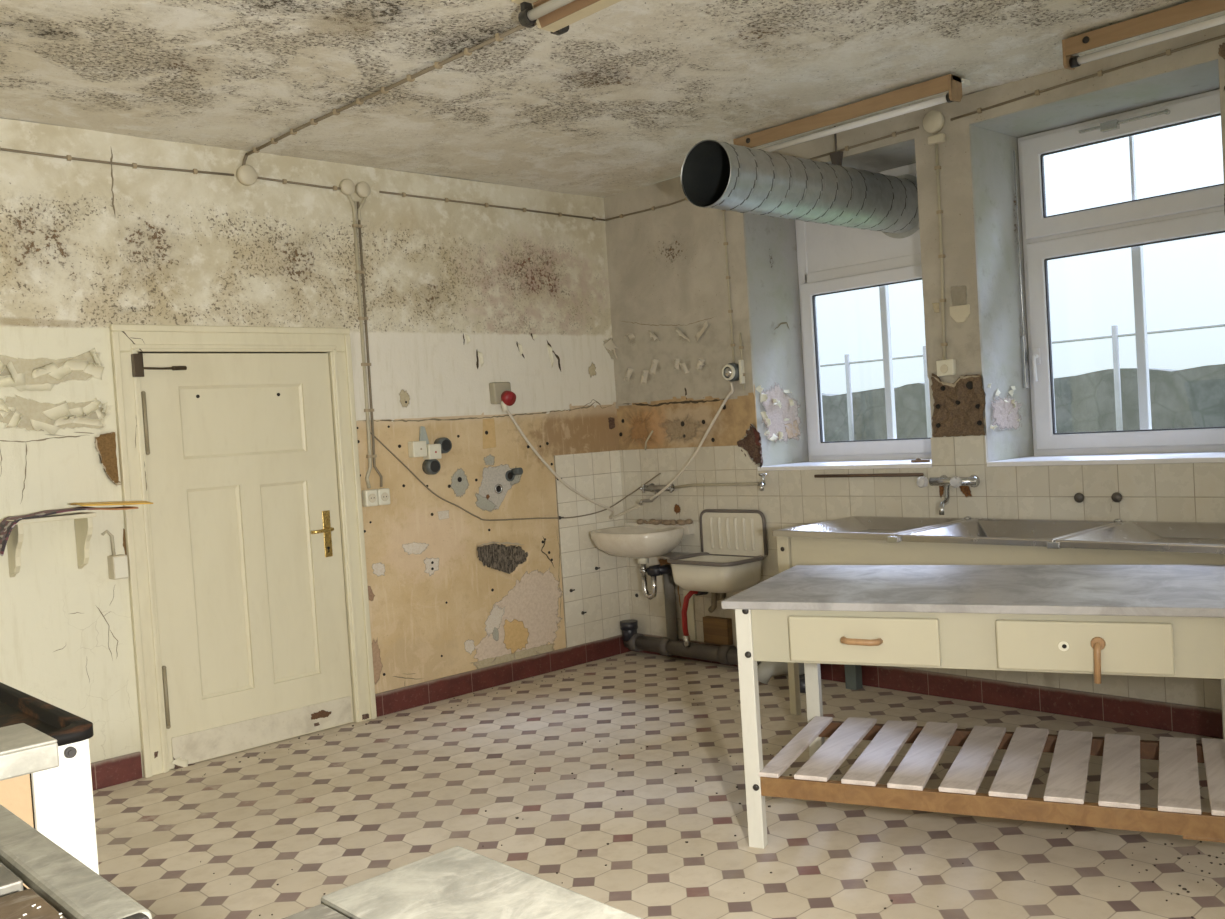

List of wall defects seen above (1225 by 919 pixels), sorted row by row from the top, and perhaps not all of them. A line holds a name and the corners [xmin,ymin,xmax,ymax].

damp [249,0,510,53]
damp [5,204,81,276]
damp [119,216,189,280]
damp [269,232,323,291]
damp [498,246,559,299]
peeling [0,348,121,485]
peeling [483,418,515,494]
peeling [737,384,800,469]
flaking render [931,373,1022,437]
crack [54,586,118,682]
flaking render [372,640,386,684]
peeling [464,529,562,669]